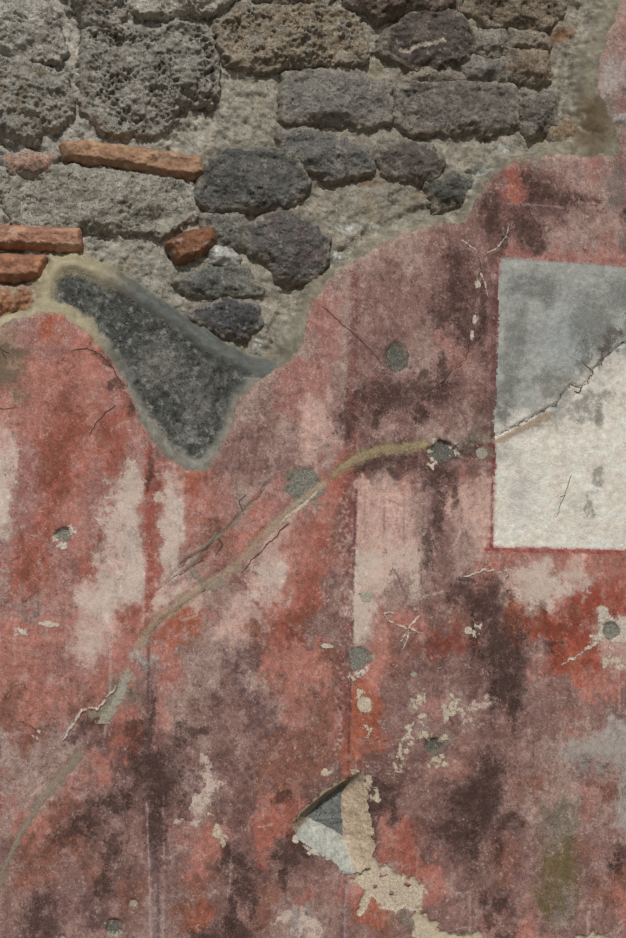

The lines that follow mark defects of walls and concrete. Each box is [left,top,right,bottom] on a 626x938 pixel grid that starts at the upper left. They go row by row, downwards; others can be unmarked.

crack [493,342,624,444]
spalling [425,438,460,470]
peeling [476,447,488,459]
crack [94,440,431,724]
damp [347,454,459,646]
damp [447,557,605,728]
spalling [393,692,464,773]
crack [0,750,85,888]
damp [369,782,401,838]
spalling [292,768,482,938]
damp [434,760,524,866]